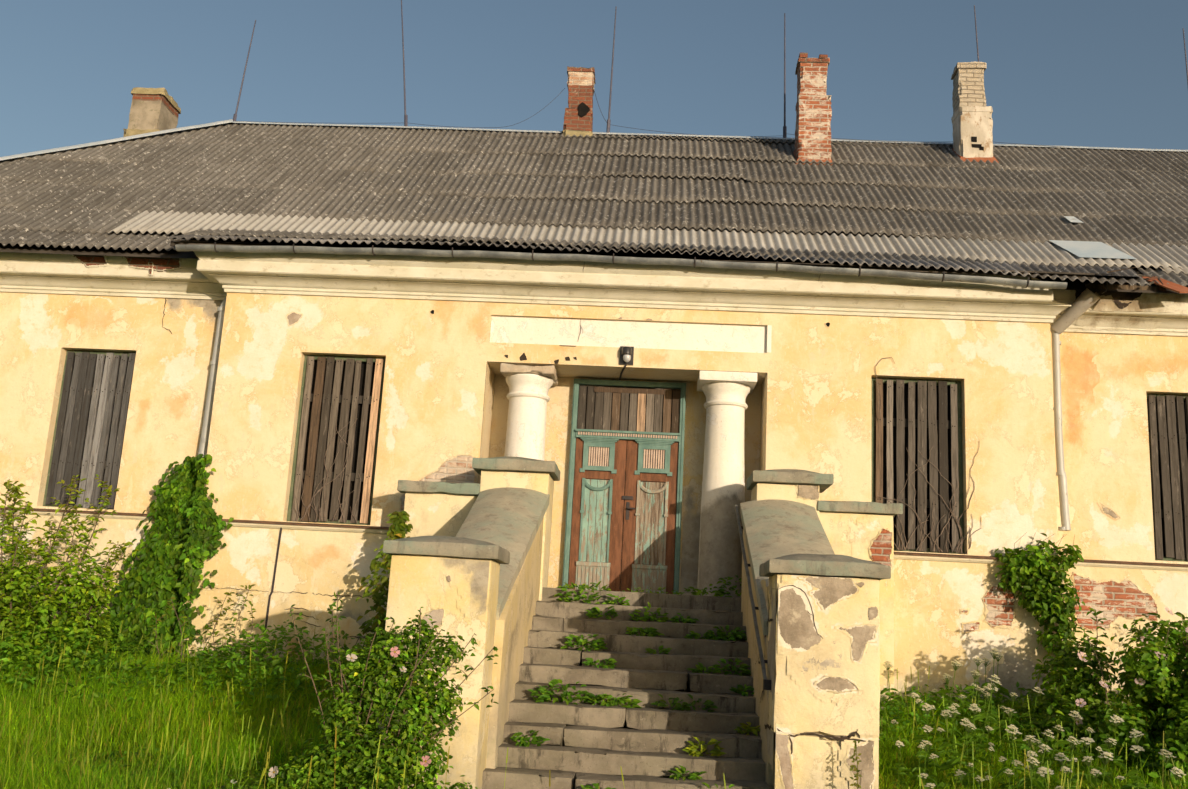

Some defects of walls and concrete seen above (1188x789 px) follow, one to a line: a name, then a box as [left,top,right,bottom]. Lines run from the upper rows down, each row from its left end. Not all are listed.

flaking render [60,254,109,268]
flaking render [122,256,181,276]
flaking render [399,453,477,530]
crack [758,585,869,754]
flaking render [777,575,879,706]
peeling [847,515,893,567]
peeling [910,471,1058,692]
peeling [1071,491,1188,631]